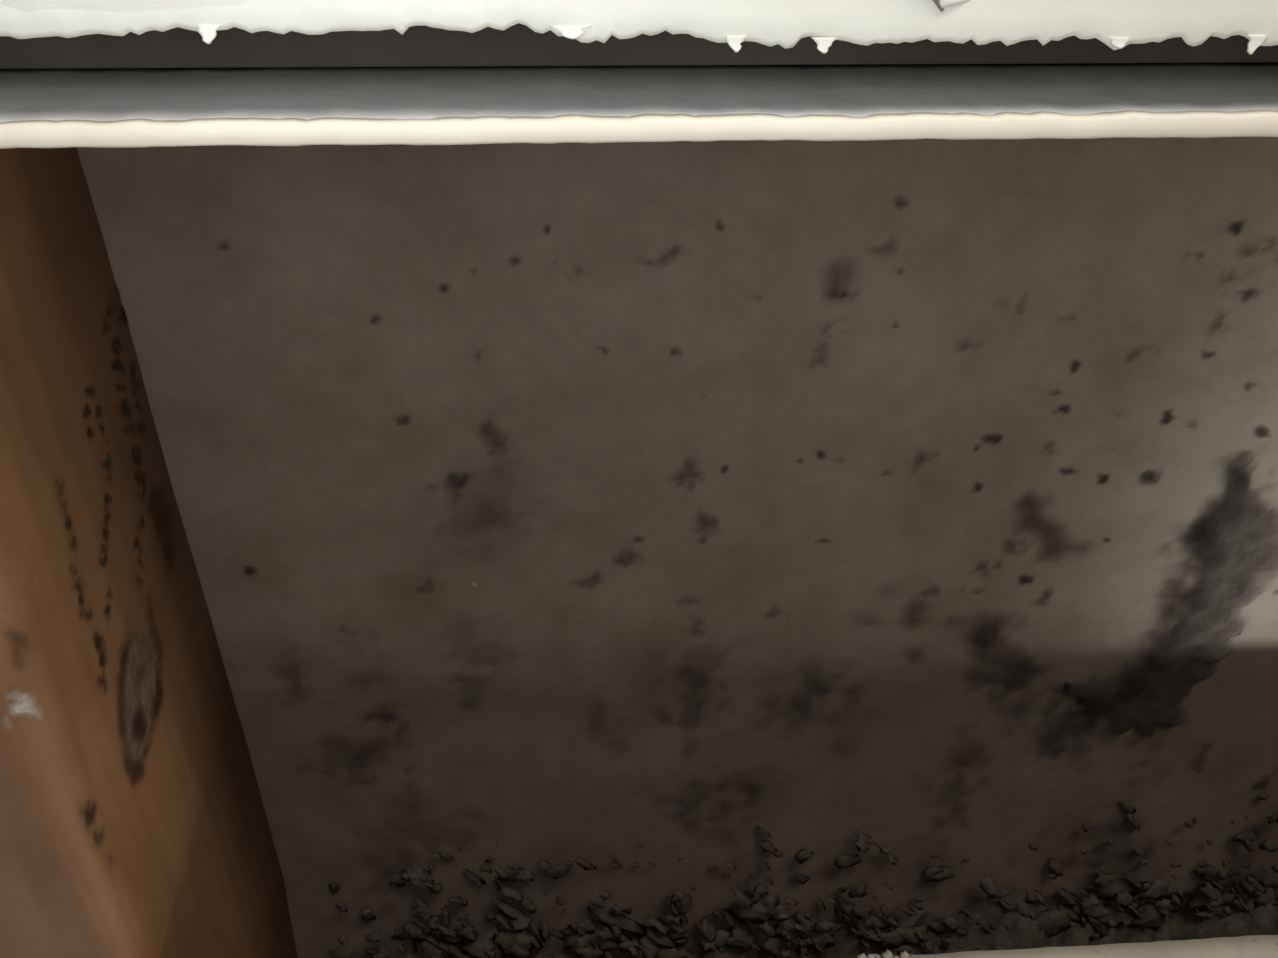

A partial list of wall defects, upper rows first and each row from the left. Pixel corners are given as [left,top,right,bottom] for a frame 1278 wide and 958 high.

peeling [933,0,970,12]
peeling [197,25,221,44]
peeling [550,26,592,39]
peeling [726,36,747,52]
peeling [811,37,838,54]
peeling [1108,37,1130,49]
peeling [1245,34,1268,54]
damp [1077,459,1278,736]